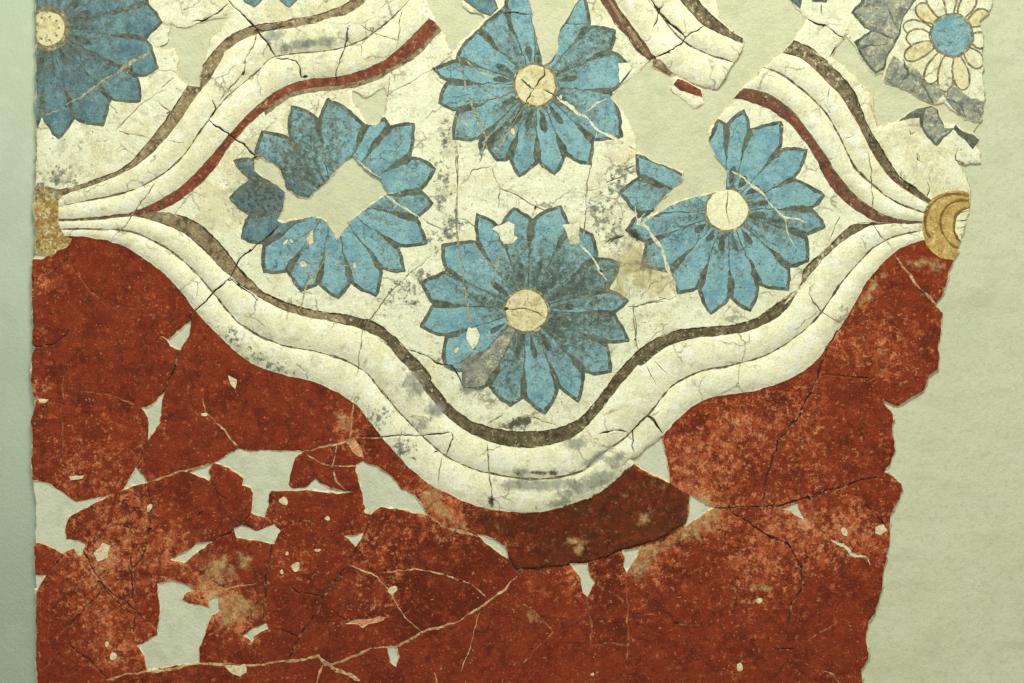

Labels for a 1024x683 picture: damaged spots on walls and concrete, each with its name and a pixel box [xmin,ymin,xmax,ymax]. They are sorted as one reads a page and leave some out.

crack [192,0,308,158]
crack [651,0,704,57]
flaking render [610,0,808,214]
crack [187,227,278,322]
flaking render [254,156,387,240]
crack [355,54,676,390]
flaking render [30,240,111,600]
flaking render [190,413,509,559]
crack [599,414,663,451]
flaking render [630,438,670,483]
crack [713,276,896,650]
flaking render [136,580,269,671]